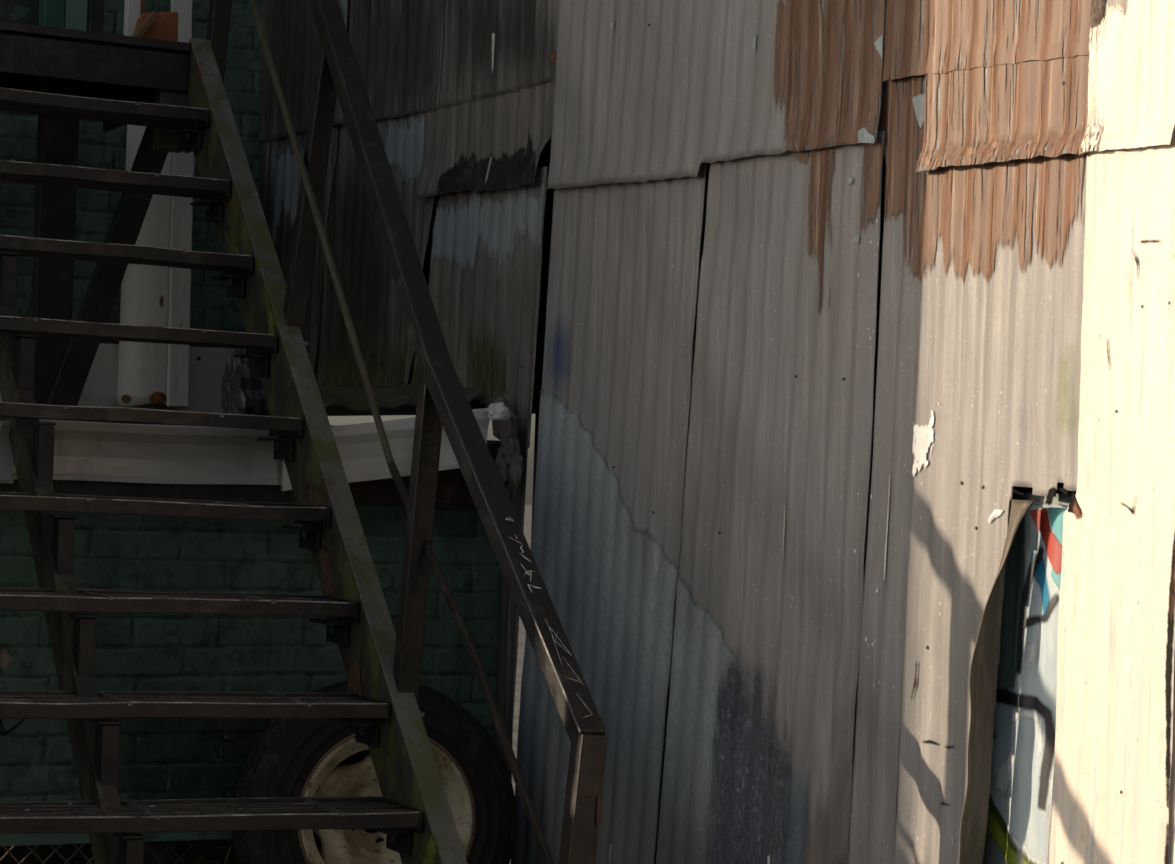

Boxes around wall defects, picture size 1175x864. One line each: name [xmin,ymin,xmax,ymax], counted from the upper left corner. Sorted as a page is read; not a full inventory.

leakage [350,0,554,120]
leakage [437,130,536,194]
crack [1164,533,1175,864]